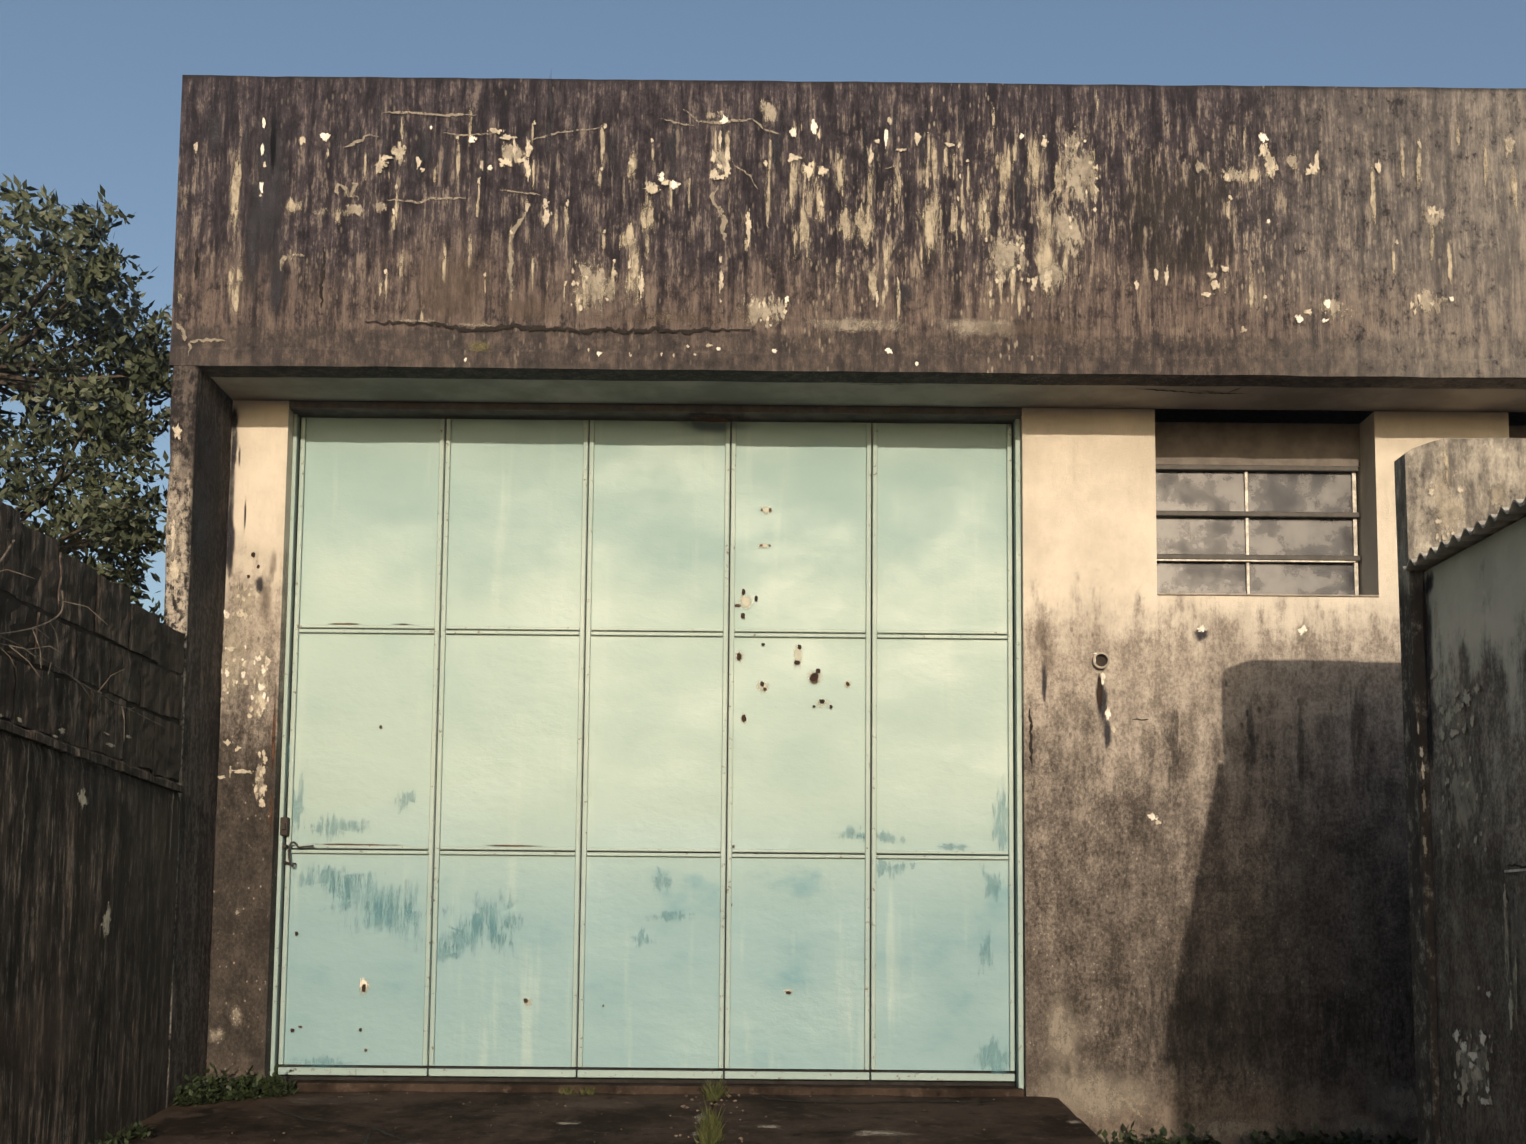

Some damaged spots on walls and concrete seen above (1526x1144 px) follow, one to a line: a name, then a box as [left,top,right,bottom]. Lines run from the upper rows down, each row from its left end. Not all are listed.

water stain [229,113,286,313]
peeling [375,118,425,174]
peeling [468,128,533,180]
crack [365,190,751,335]
crack [529,127,599,141]
peeling [627,152,681,235]
peeling [702,100,777,180]
water stain [763,88,912,331]
water stain [919,126,1068,334]
corrosion [735,589,758,619]
corrosion [794,645,833,709]
crack [1507,864,1526,875]